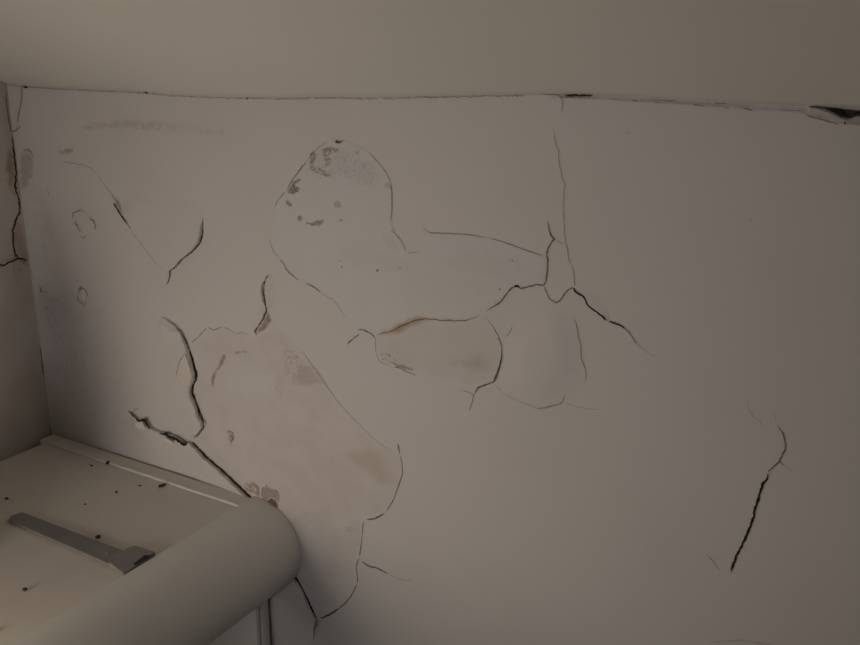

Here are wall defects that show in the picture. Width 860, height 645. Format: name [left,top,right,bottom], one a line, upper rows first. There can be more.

crack [4,86,29,268]
peeling [803,107,860,125]
crack [348,134,637,410]
crack [709,427,786,572]